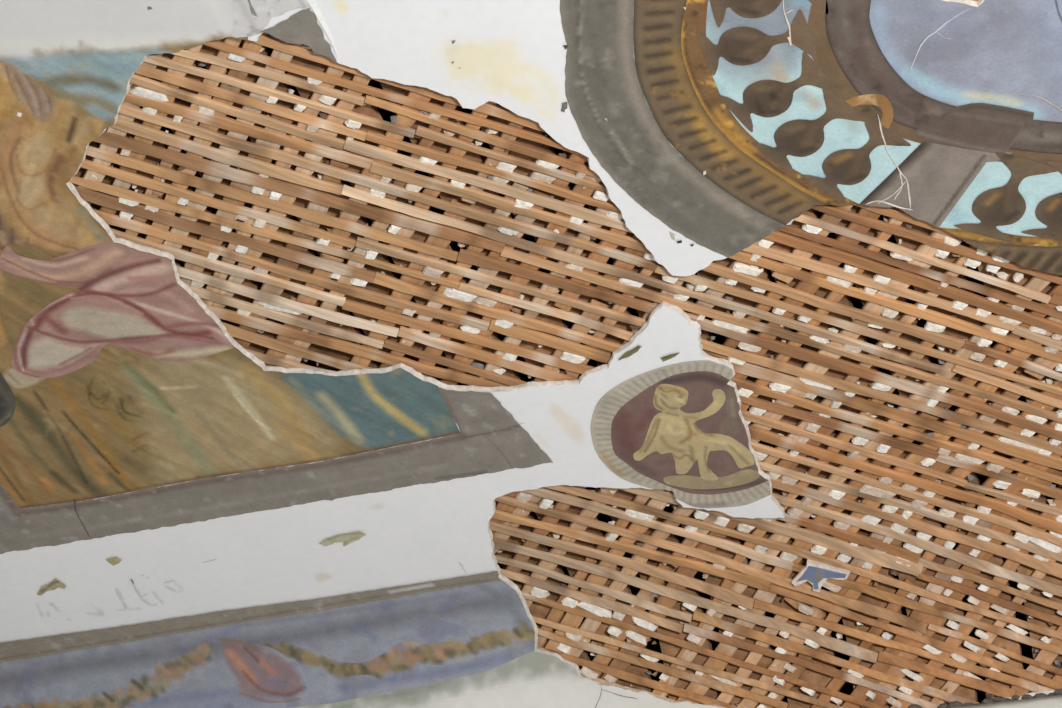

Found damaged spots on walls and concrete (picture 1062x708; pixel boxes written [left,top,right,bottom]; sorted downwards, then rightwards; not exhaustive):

flaking render [66,32,1062,486]
peeling [37,578,66,596]
peeling [319,531,366,546]
flaking render [487,406,1062,708]